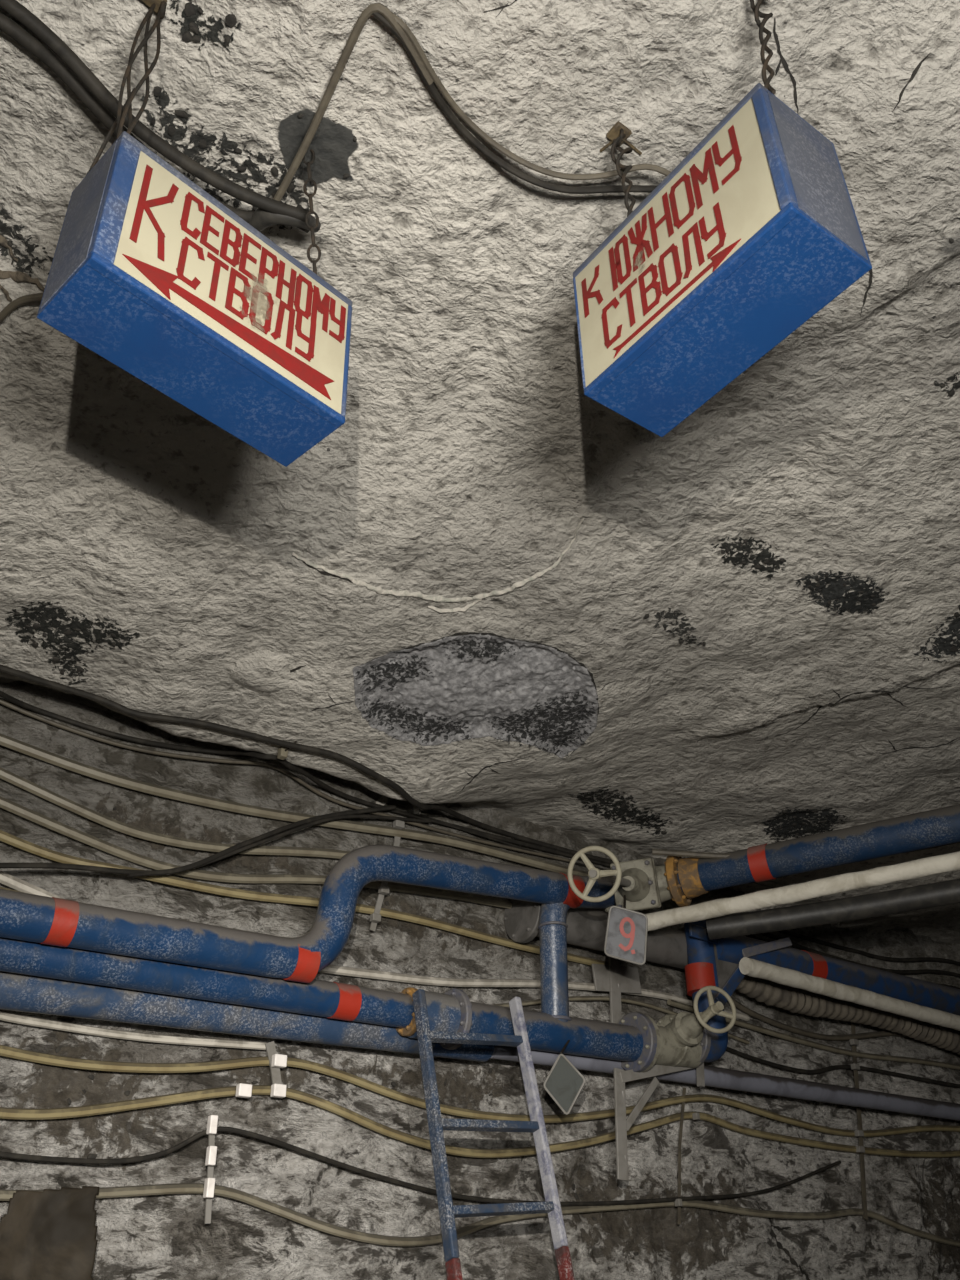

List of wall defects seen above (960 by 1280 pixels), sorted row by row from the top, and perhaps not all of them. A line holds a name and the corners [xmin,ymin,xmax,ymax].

crack [484,0,517,17]
crack [861,269,873,312]
crack [756,1200,810,1280]